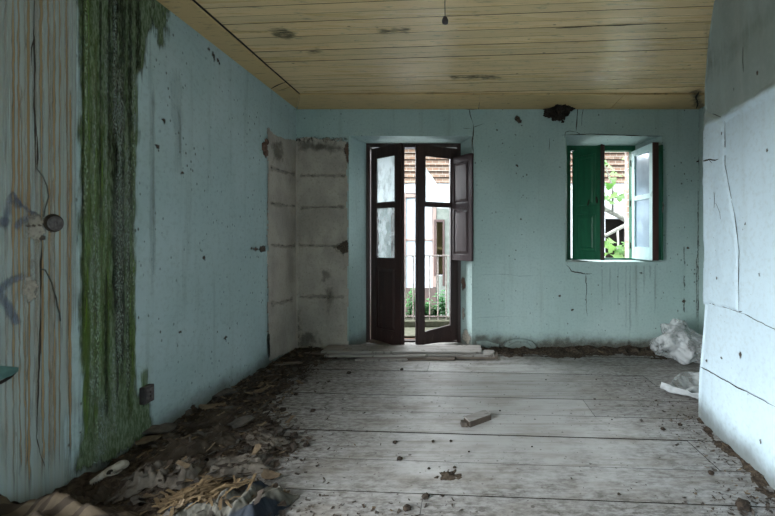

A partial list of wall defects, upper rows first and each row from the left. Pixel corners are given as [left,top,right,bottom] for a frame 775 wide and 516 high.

water stain [0,0,148,503]
crack [696,159,774,329]